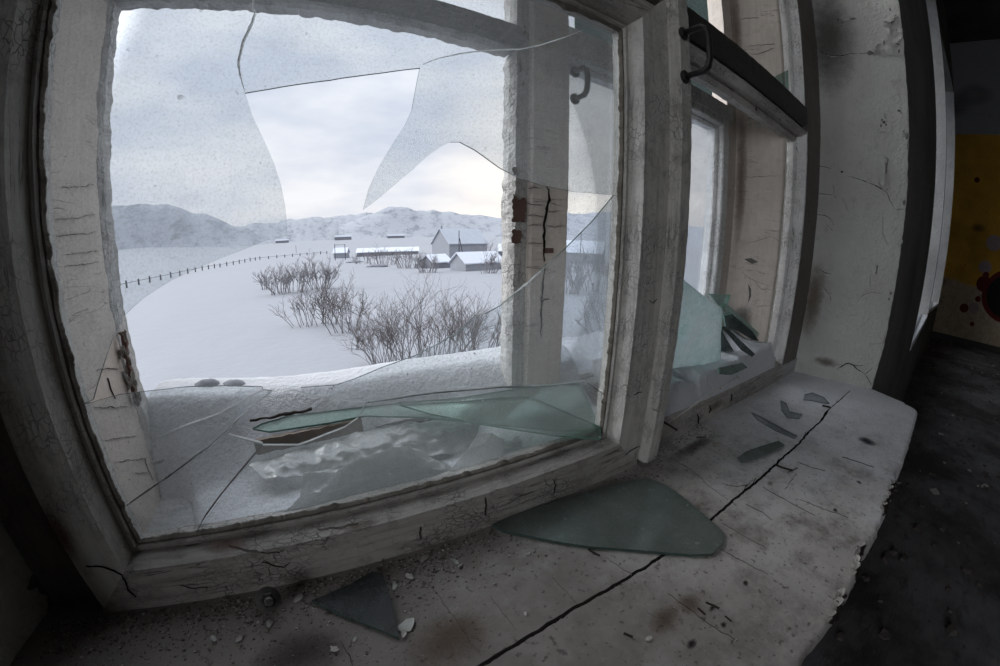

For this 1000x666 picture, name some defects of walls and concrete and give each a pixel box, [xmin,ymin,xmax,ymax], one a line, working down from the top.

crack [57,214,97,267]
crack [514,186,559,338]
crack [670,363,874,575]
crack [86,565,136,598]
crack [433,555,665,666]